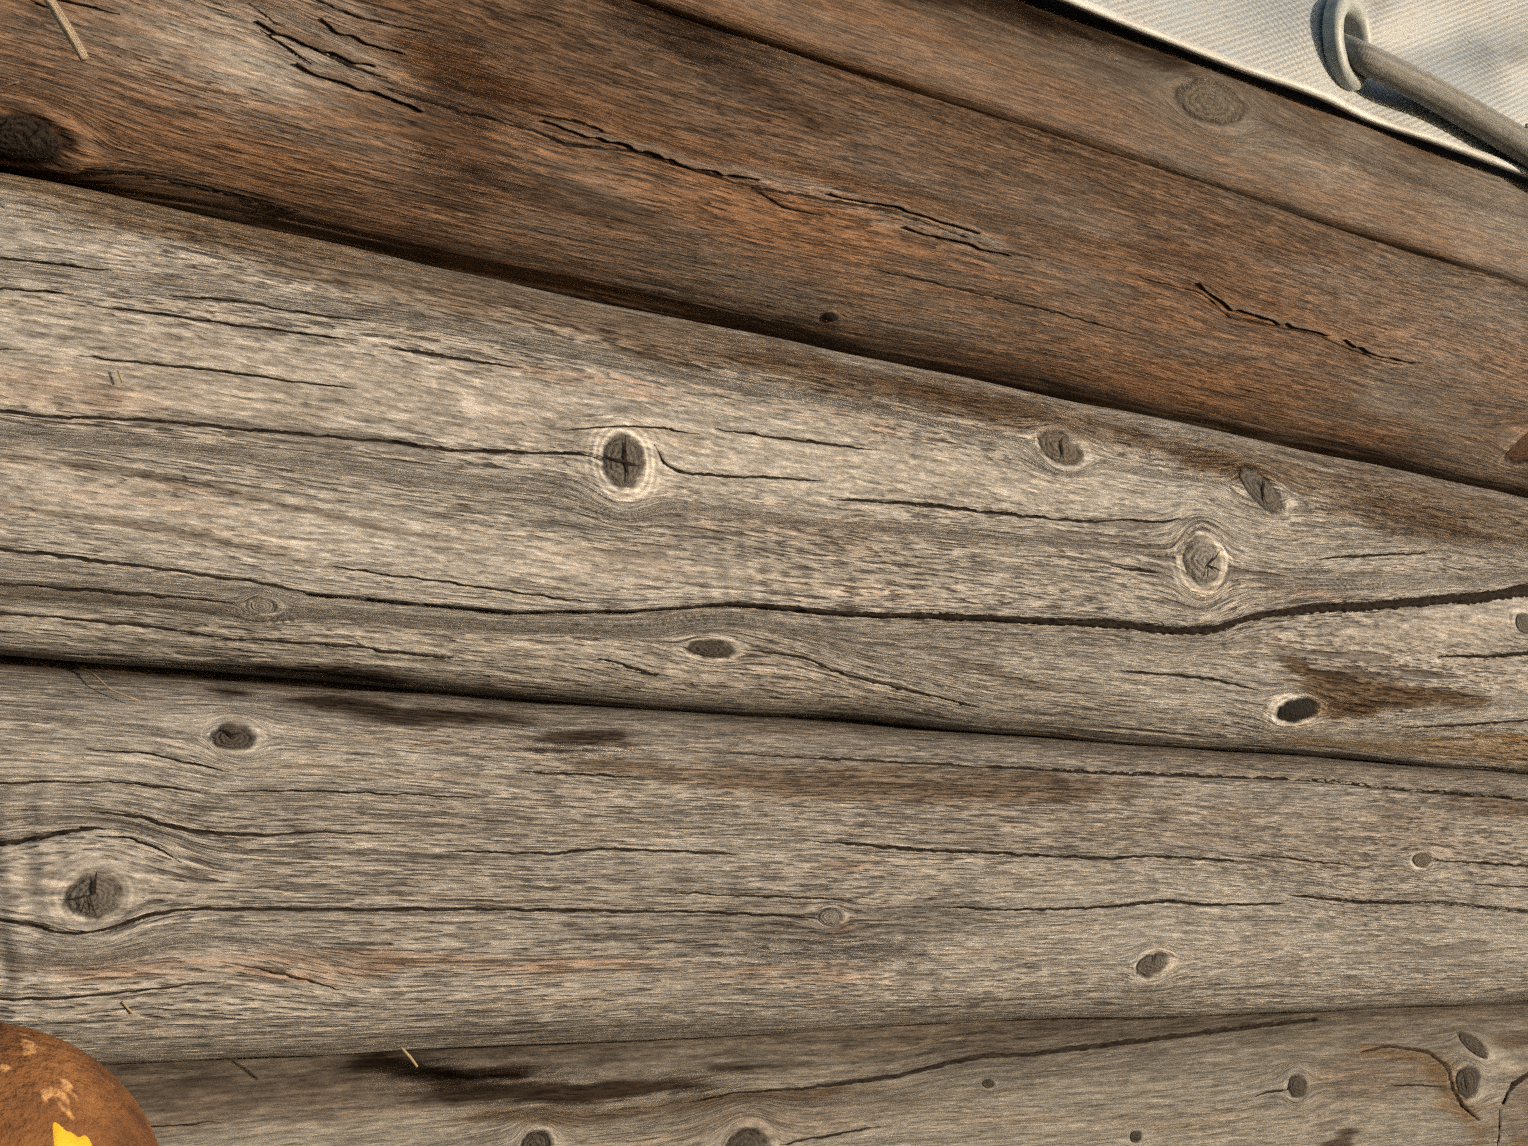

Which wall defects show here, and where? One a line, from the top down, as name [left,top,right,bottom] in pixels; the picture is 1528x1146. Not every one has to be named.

crack [249,0,1047,260]
crack [877,269,1137,335]
crack [1140,277,1402,365]
crack [0,547,1528,658]
crack [600,658,660,676]
crack [747,649,979,707]
crack [1122,670,1259,691]
crack [1360,1045,1528,1146]